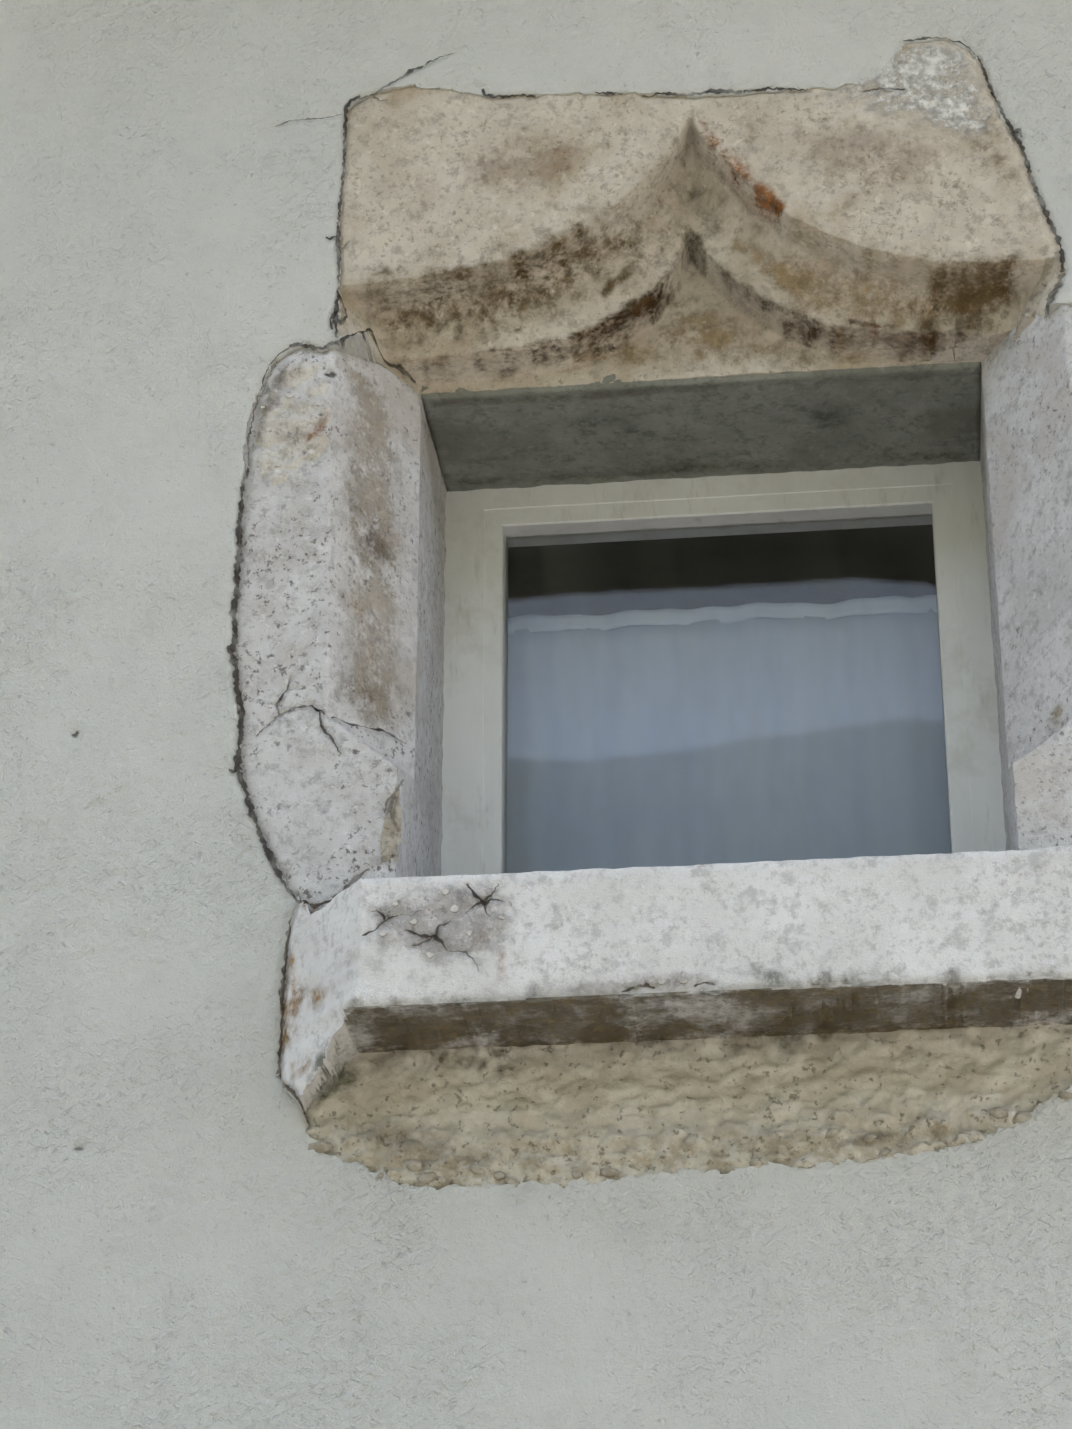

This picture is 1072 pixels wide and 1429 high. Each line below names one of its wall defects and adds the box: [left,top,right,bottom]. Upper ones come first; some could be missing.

crack [482,89,535,99]
crack [595,87,808,98]
corrosion [710,137,783,214]
crack [903,37,1065,314]
leakage [393,224,635,332]
leakage [756,252,1011,330]
crack [227,53,453,1124]
crack [362,884,503,971]
flaking render [306,1021,1072,1190]